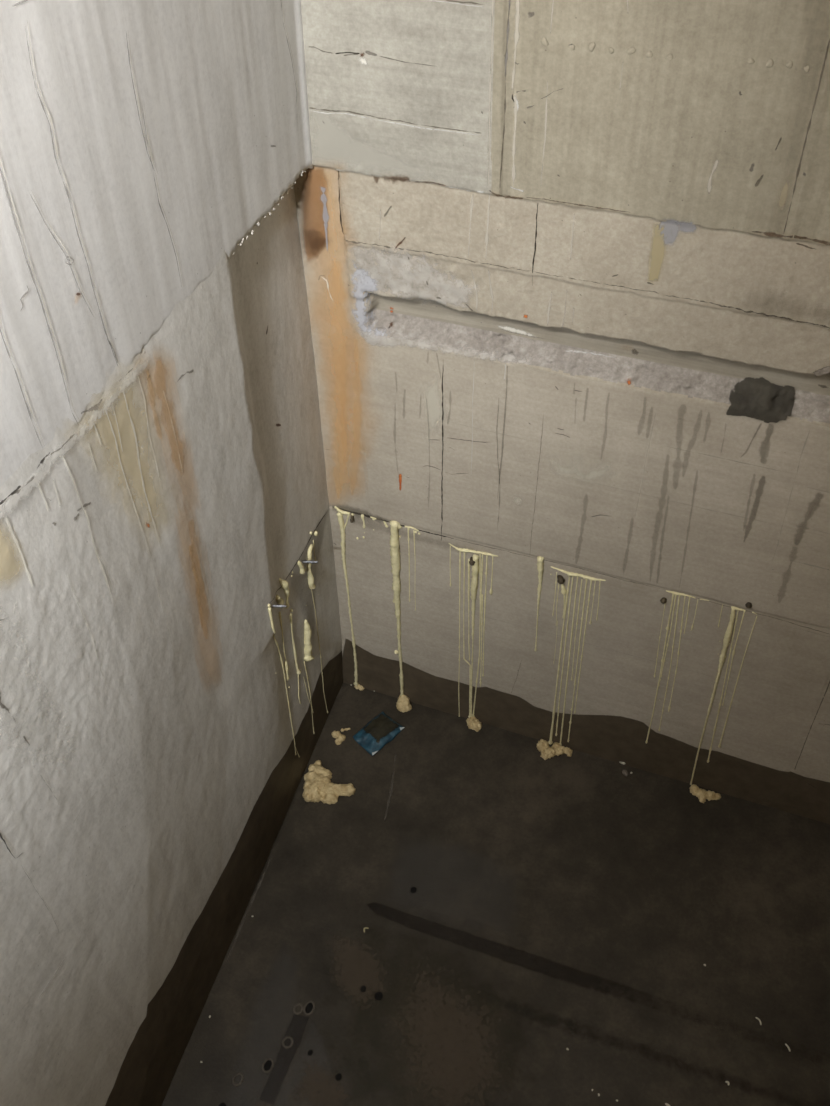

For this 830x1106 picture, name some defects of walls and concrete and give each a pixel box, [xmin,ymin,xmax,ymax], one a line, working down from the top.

crack [0,0,119,423]
rust [304,170,325,258]
crack [281,0,520,188]
crack [338,171,829,328]
crack [784,40,830,231]
crack [0,317,44,446]